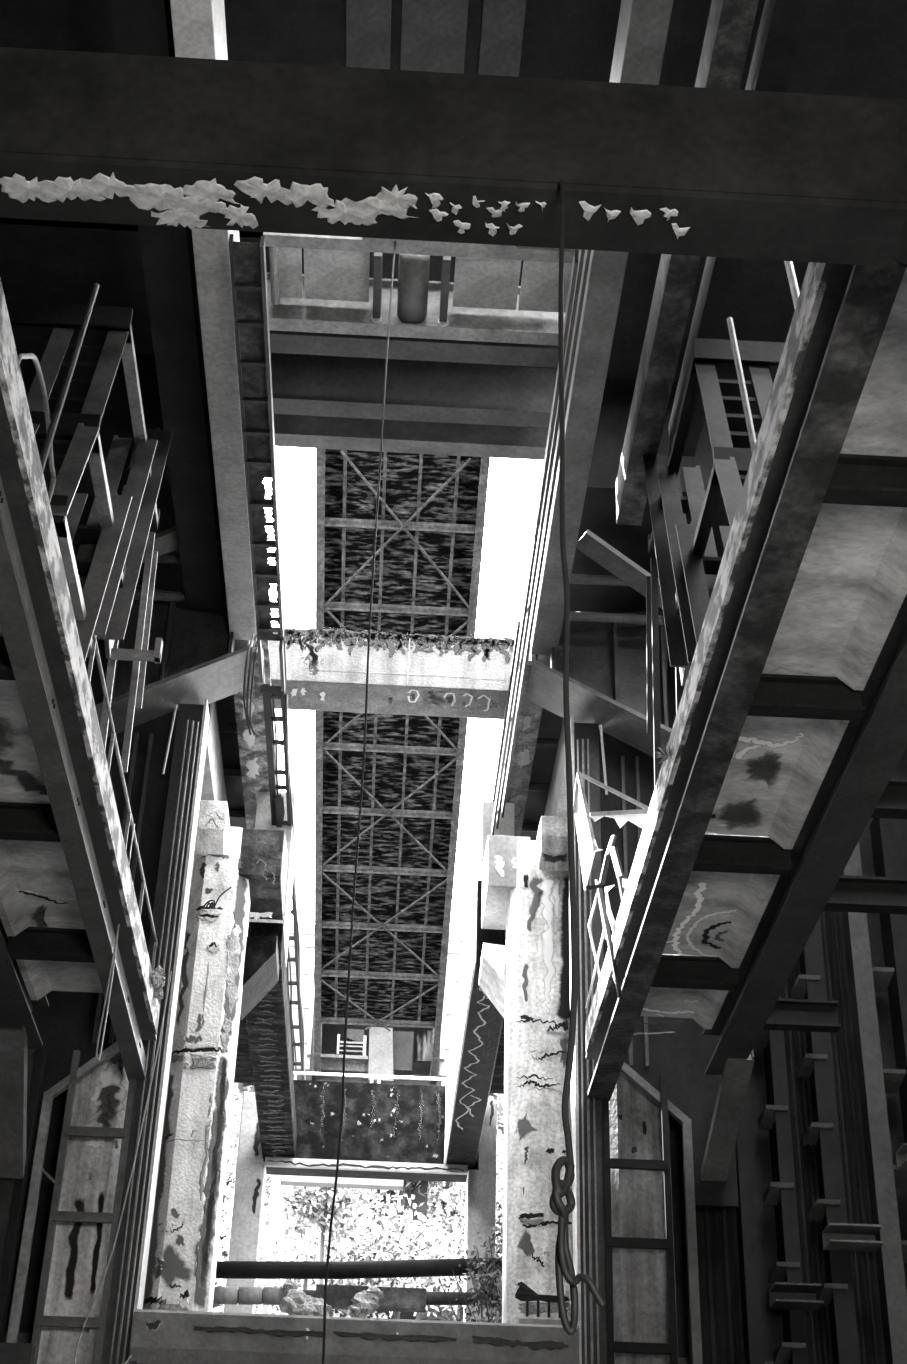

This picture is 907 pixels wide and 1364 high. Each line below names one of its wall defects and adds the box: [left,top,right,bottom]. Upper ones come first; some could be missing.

peeling [0,172,546,237]
peeling [579,201,690,239]
damp [0,718,47,795]
damp [735,732,804,785]
damp [705,799,760,835]
crack [514,1014,567,1092]
damp [64,1193,104,1300]